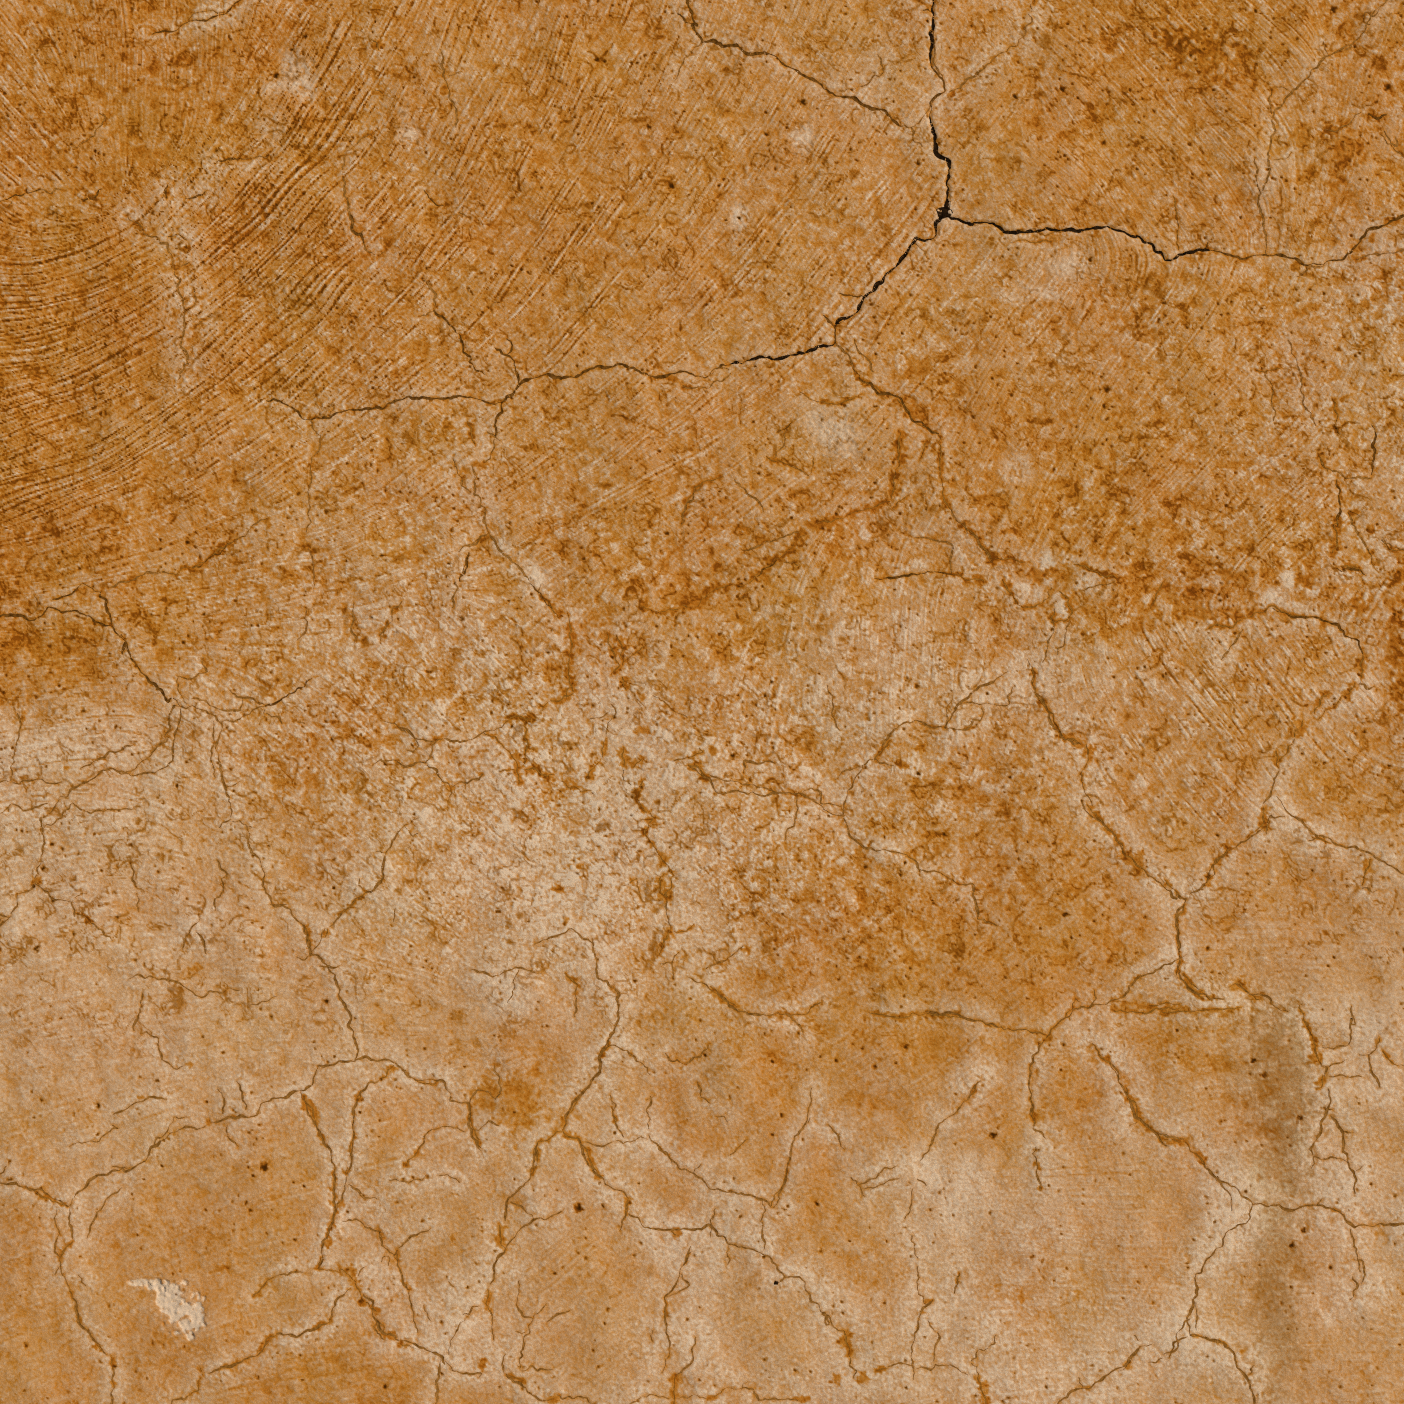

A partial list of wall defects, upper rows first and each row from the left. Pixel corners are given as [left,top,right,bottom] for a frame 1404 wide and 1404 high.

crack [128,0,408,272]
crack [401,38,484,240]
crack [1309,96,1404,181]
crack [0,84,292,410]
crack [1247,330,1404,590]
crack [333,580,425,661]
crack [1131,561,1180,631]
crack [613,740,661,772]
crack [0,496,370,1404]
crack [1255,977,1404,1350]
crack [145,1242,506,1404]
crack [592,1195,885,1404]